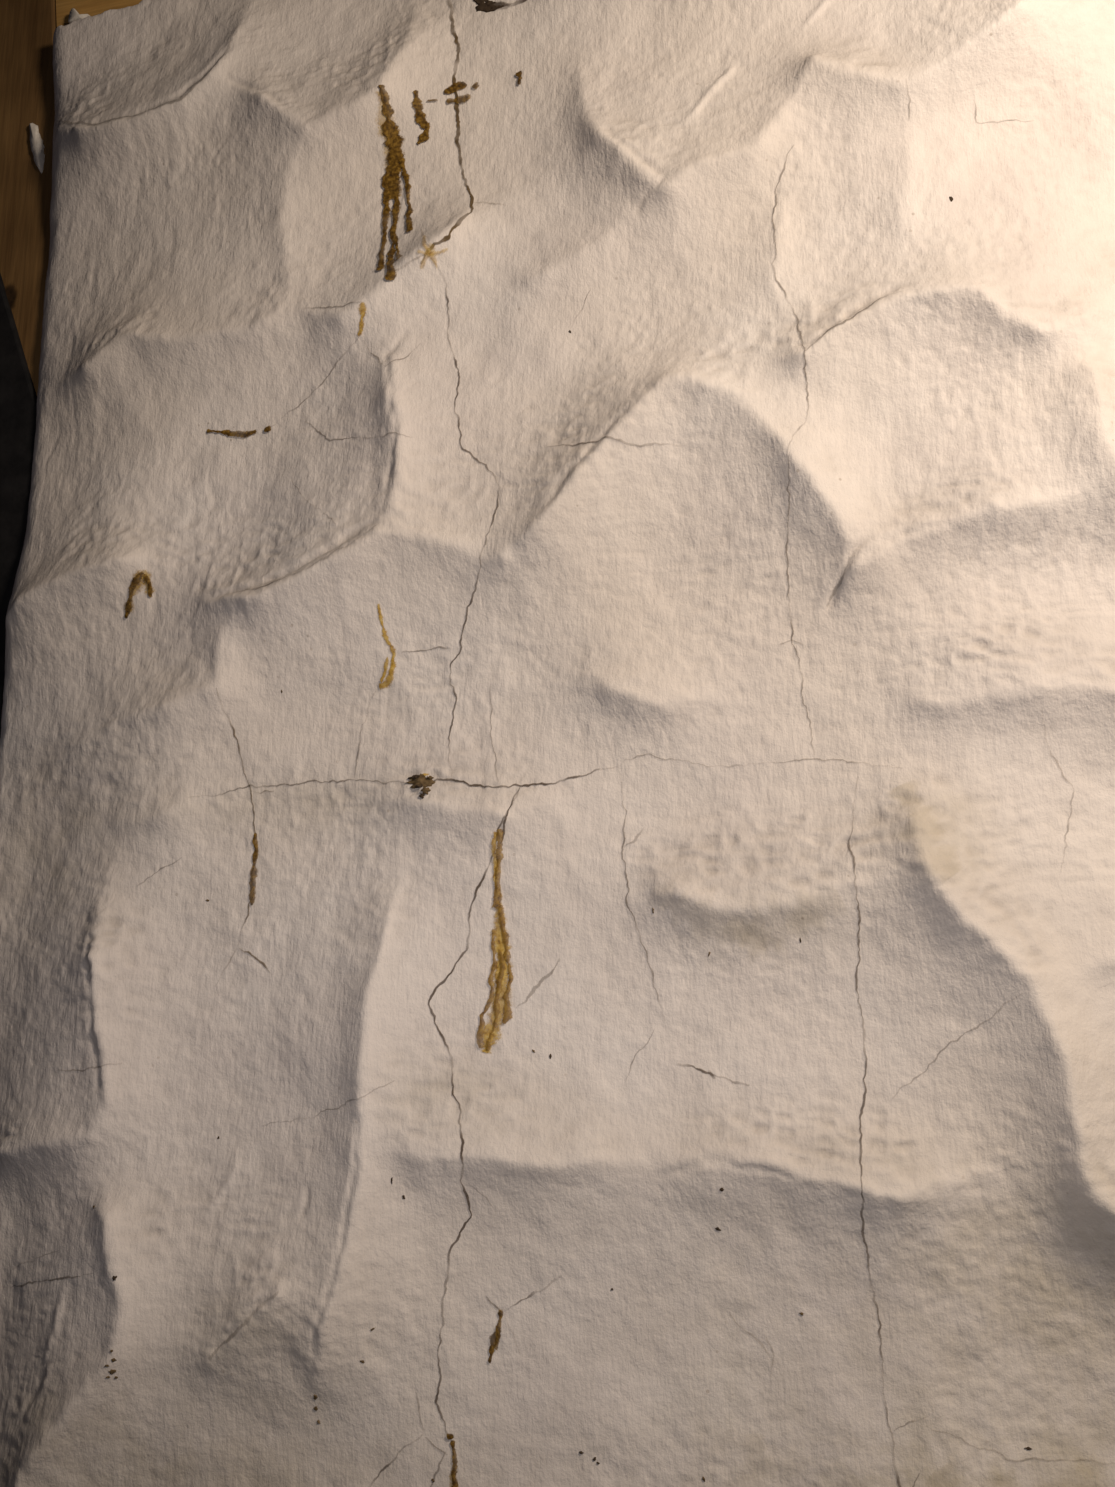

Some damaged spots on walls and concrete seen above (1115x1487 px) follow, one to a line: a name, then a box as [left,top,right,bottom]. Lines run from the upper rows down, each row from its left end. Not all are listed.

corrosion [376,81,479,281]
crack [427,16,474,251]
corrosion [207,425,271,438]
crack [454,358,499,522]
corrosion [124,571,154,619]
crack [448,589,476,741]
corrosion [249,833,258,905]
corrosion [477,829,513,1053]
crack [428,775,586,1252]
crack [848,845,862,1015]
crack [859,1062,870,1259]
corrosion [488,1310,503,1363]